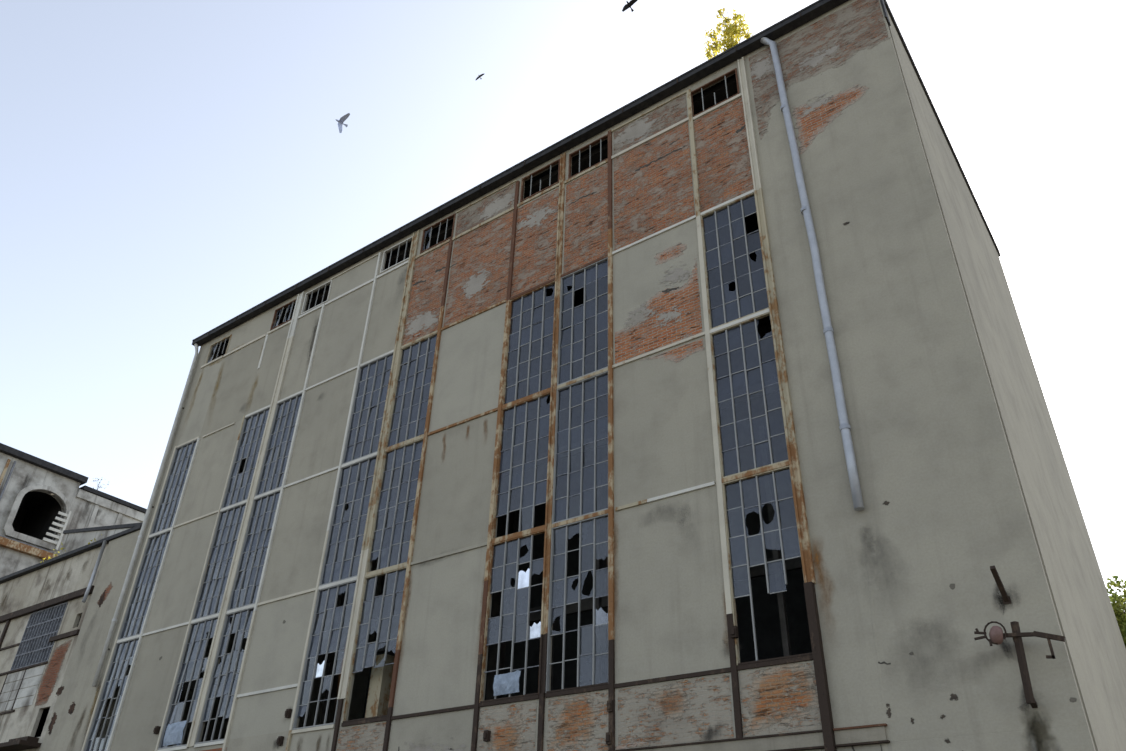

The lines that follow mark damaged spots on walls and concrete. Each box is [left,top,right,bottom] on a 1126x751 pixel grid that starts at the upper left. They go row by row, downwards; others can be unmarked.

flaking render [402,0,890,364]
flaking render [477,662,822,751]
water stain [1029,718,1049,751]